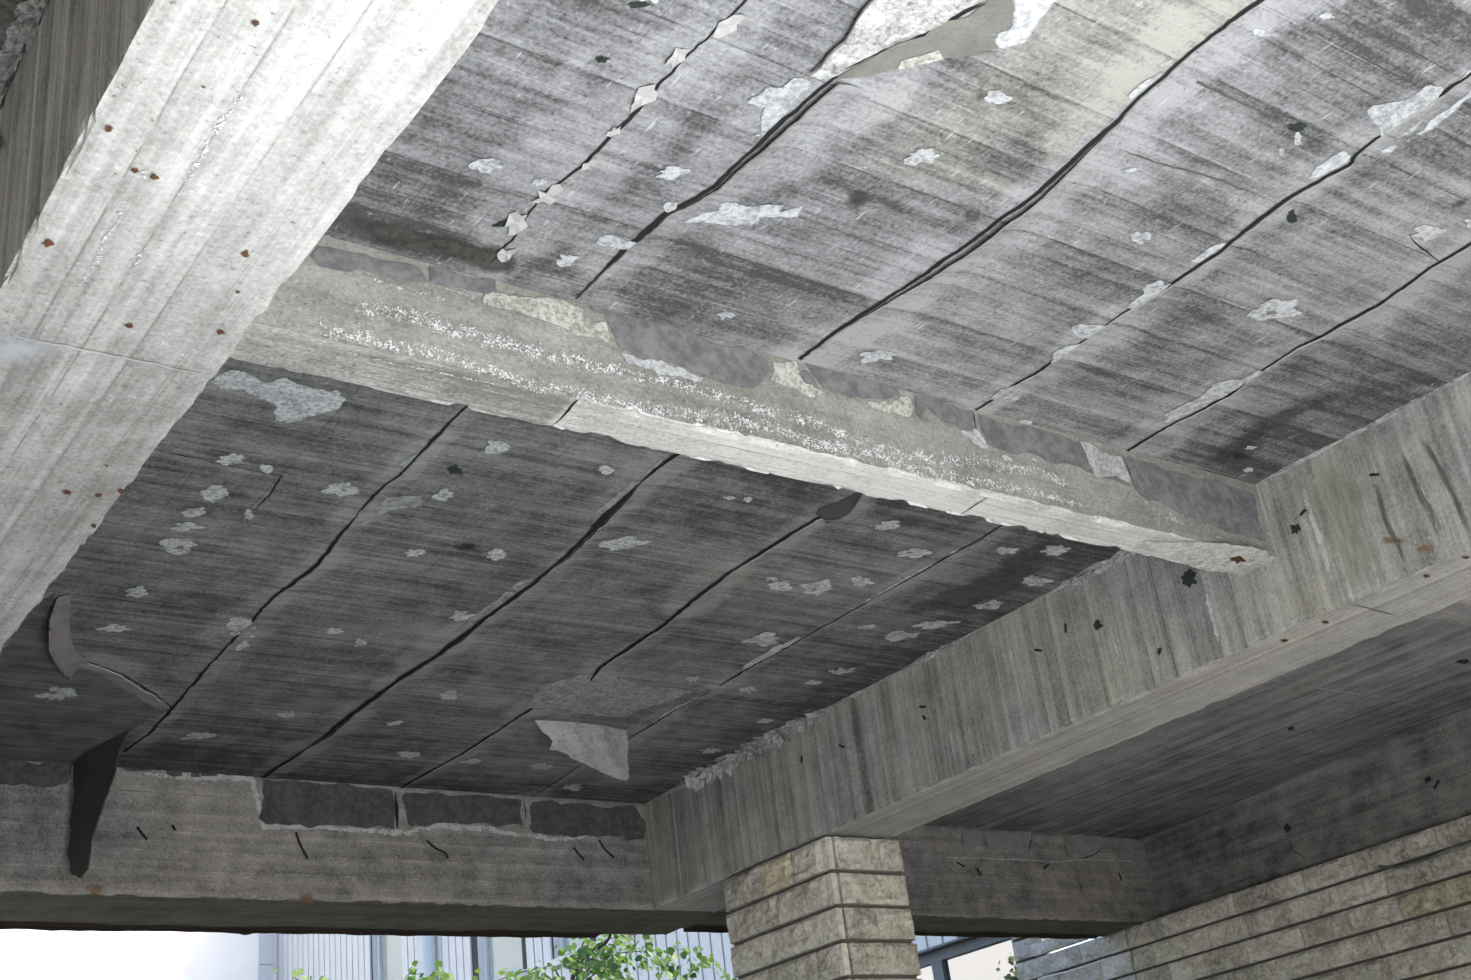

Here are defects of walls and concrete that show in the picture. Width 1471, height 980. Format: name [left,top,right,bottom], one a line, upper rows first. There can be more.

crack [488,0,747,265]
crack [576,0,987,305]
peeling [748,63,822,136]
spalling [834,0,1056,80]
peeling [984,90,1013,104]
crack [798,0,1471,429]
peeling [211,370,346,423]
peeling [311,243,1270,572]
crack [79,406,482,753]
crack [261,453,700,779]
crack [590,494,1012,744]
peeling [259,779,646,841]